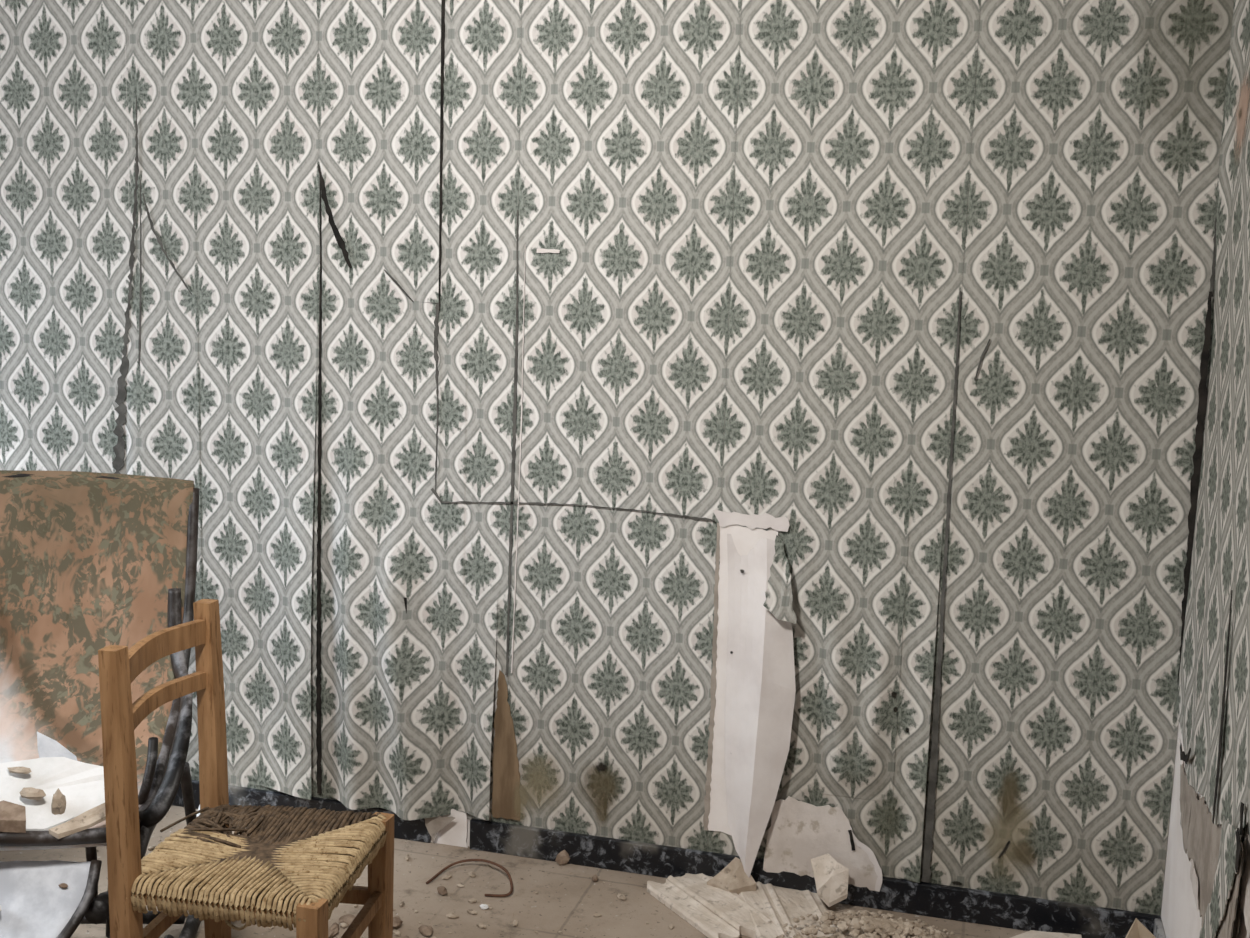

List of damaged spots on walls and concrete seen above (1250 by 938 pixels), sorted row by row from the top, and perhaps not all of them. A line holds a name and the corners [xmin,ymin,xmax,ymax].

spalling [1167,738,1250,938]